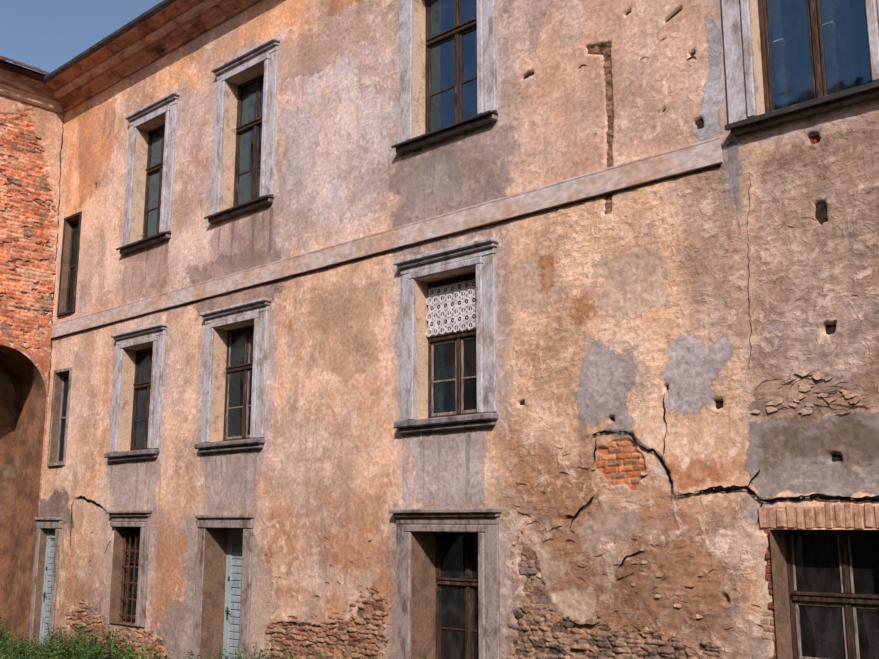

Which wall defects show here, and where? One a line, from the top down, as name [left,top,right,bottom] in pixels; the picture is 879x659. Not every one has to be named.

peeling [662,335,733,415]
peeling [751,367,870,420]
crack [592,393,879,524]
crack [70,495,106,545]
crack [562,496,594,528]
spalling [499,340,726,659]
spalling [264,585,389,659]
spalling [751,604,777,658]